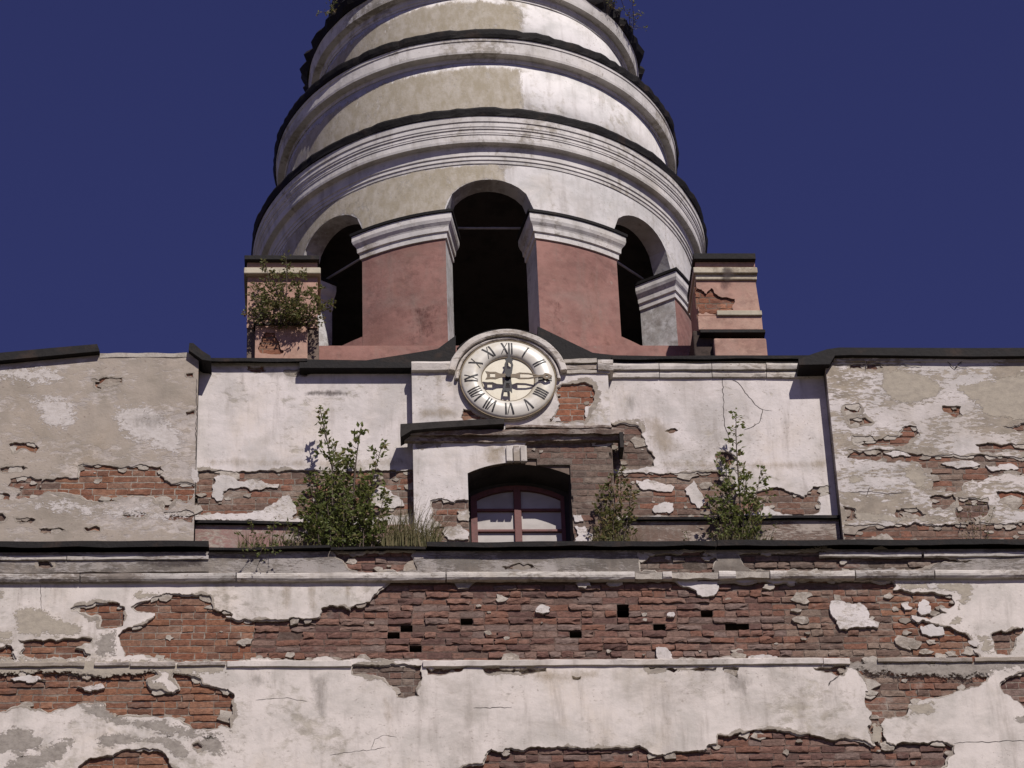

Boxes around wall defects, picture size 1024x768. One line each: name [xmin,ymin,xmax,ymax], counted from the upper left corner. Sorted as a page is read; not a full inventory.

spalling [694,287,735,317]
crack [722,378,770,437]
spalling [0,362,1024,768]